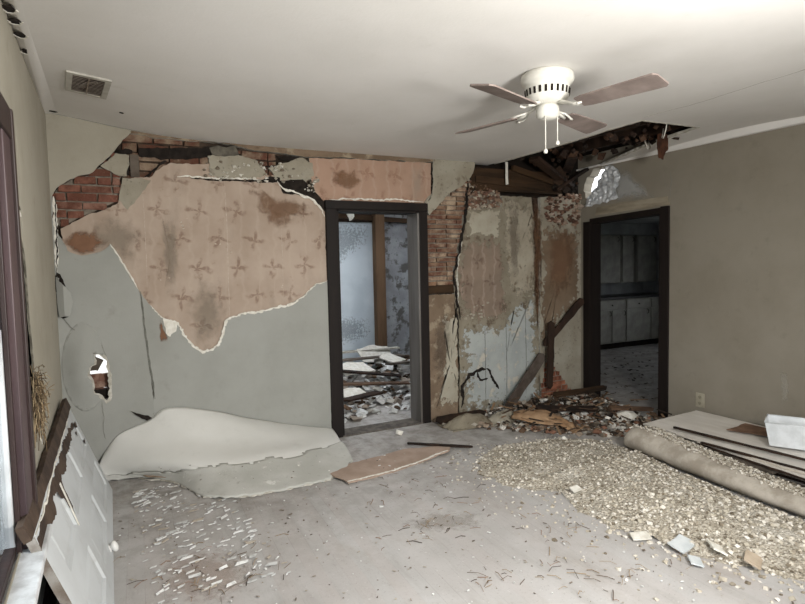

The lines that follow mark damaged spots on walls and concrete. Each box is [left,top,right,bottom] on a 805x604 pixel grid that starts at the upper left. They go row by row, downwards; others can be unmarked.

spalling [21,238,35,398]
spalling [88,353,112,403]
peeling [52,134,433,354]
crack [453,181,476,345]
crack [460,367,499,408]
peeling [427,179,584,411]
peeling [37,422,85,549]